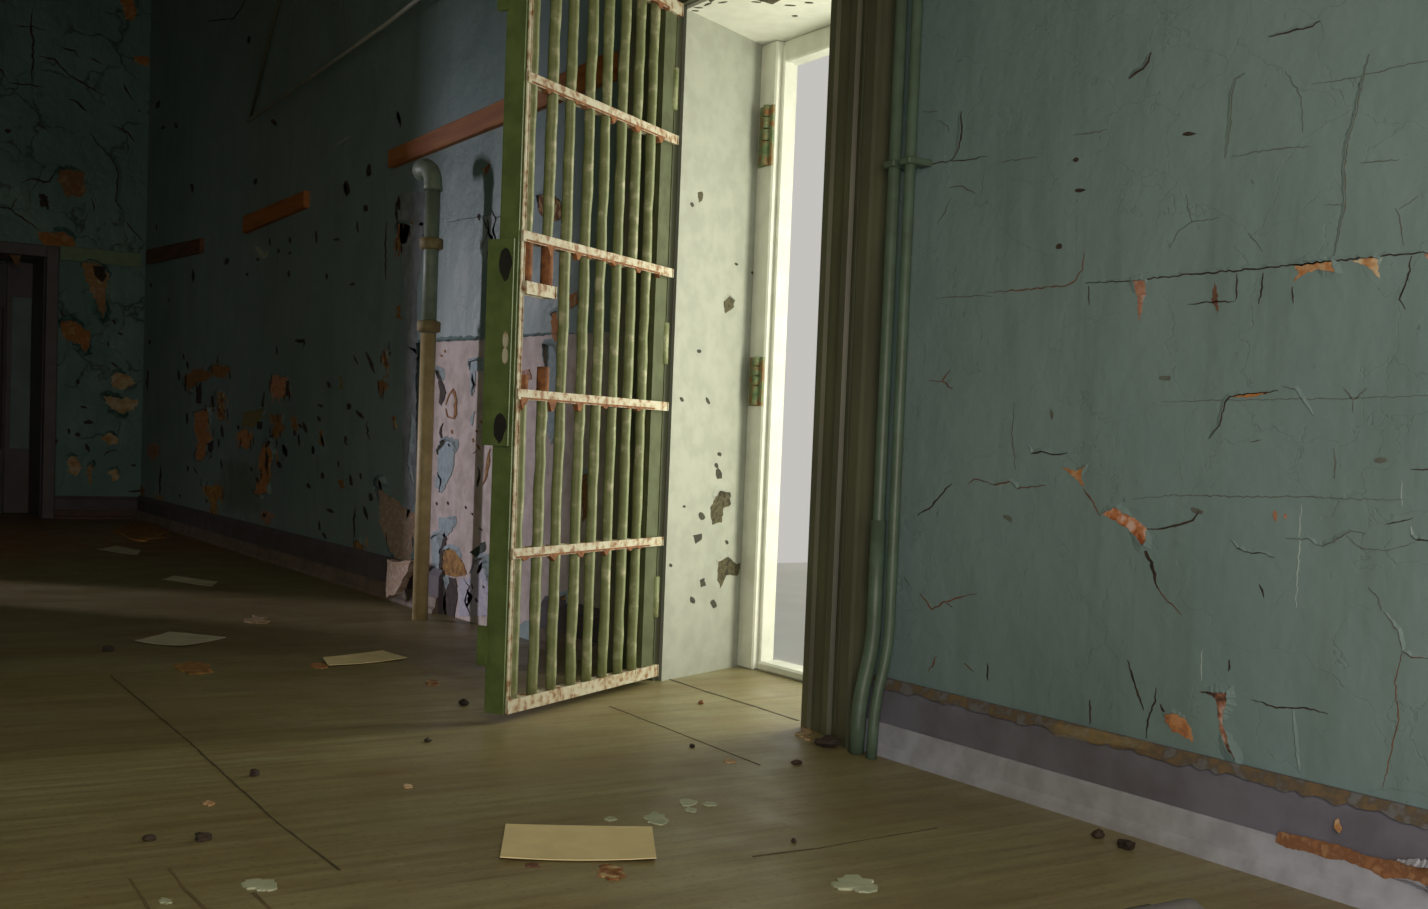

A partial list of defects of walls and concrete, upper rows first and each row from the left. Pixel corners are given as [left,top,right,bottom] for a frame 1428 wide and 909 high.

crack [923,52,1428,308]
flaking render [306,191,493,626]
flaking render [520,292,609,624]
peeling [683,452,733,544]
peeling [690,540,740,608]
crack [917,403,1067,516]
flaking render [1100,501,1203,589]
crack [1135,448,1428,597]
crack [1161,385,1428,439]
crack [1127,660,1156,738]
crack [1368,587,1428,784]
spalling [1275,831,1428,892]